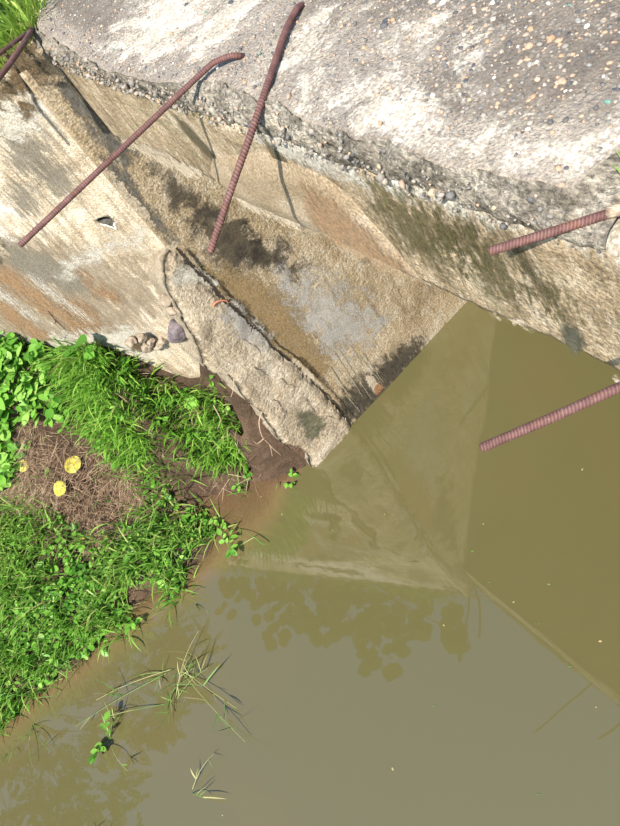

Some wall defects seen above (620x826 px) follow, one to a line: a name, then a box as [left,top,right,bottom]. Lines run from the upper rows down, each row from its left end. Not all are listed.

spalling [0,2,620,256]
leakage [0,74,425,423]
crack [175,247,354,425]
spalling [365,375,381,393]
leakage [254,132,586,355]
spalling [479,376,620,452]
leakage [605,217,620,262]